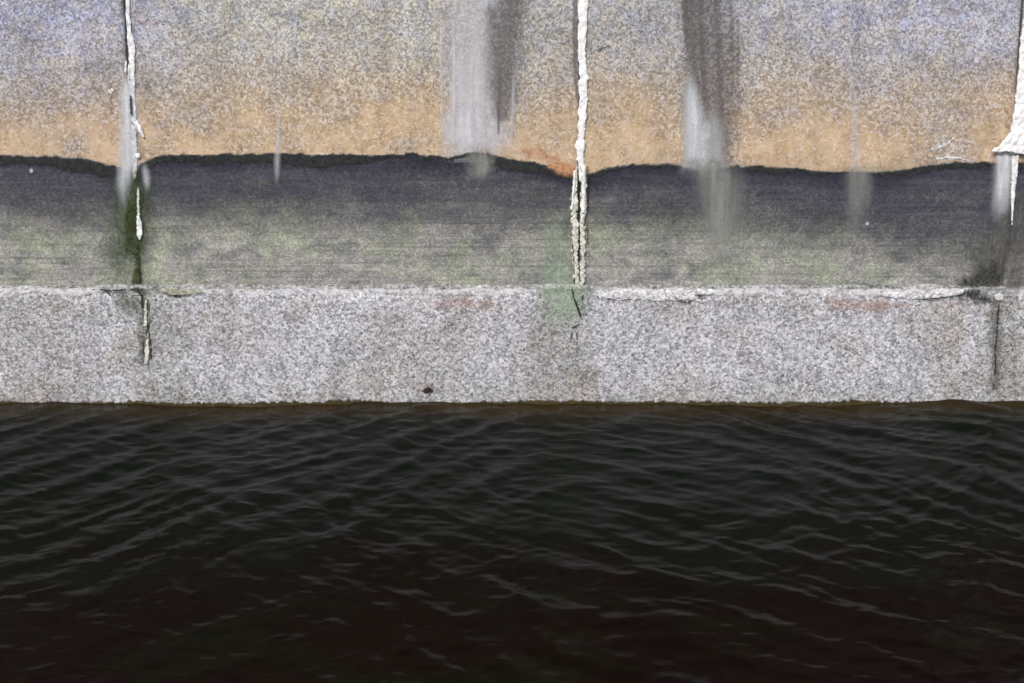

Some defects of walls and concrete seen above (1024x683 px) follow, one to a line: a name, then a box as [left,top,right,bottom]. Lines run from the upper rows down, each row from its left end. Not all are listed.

damp [0,0,1024,304]
crack [92,287,152,364]
crack [991,299,1001,390]